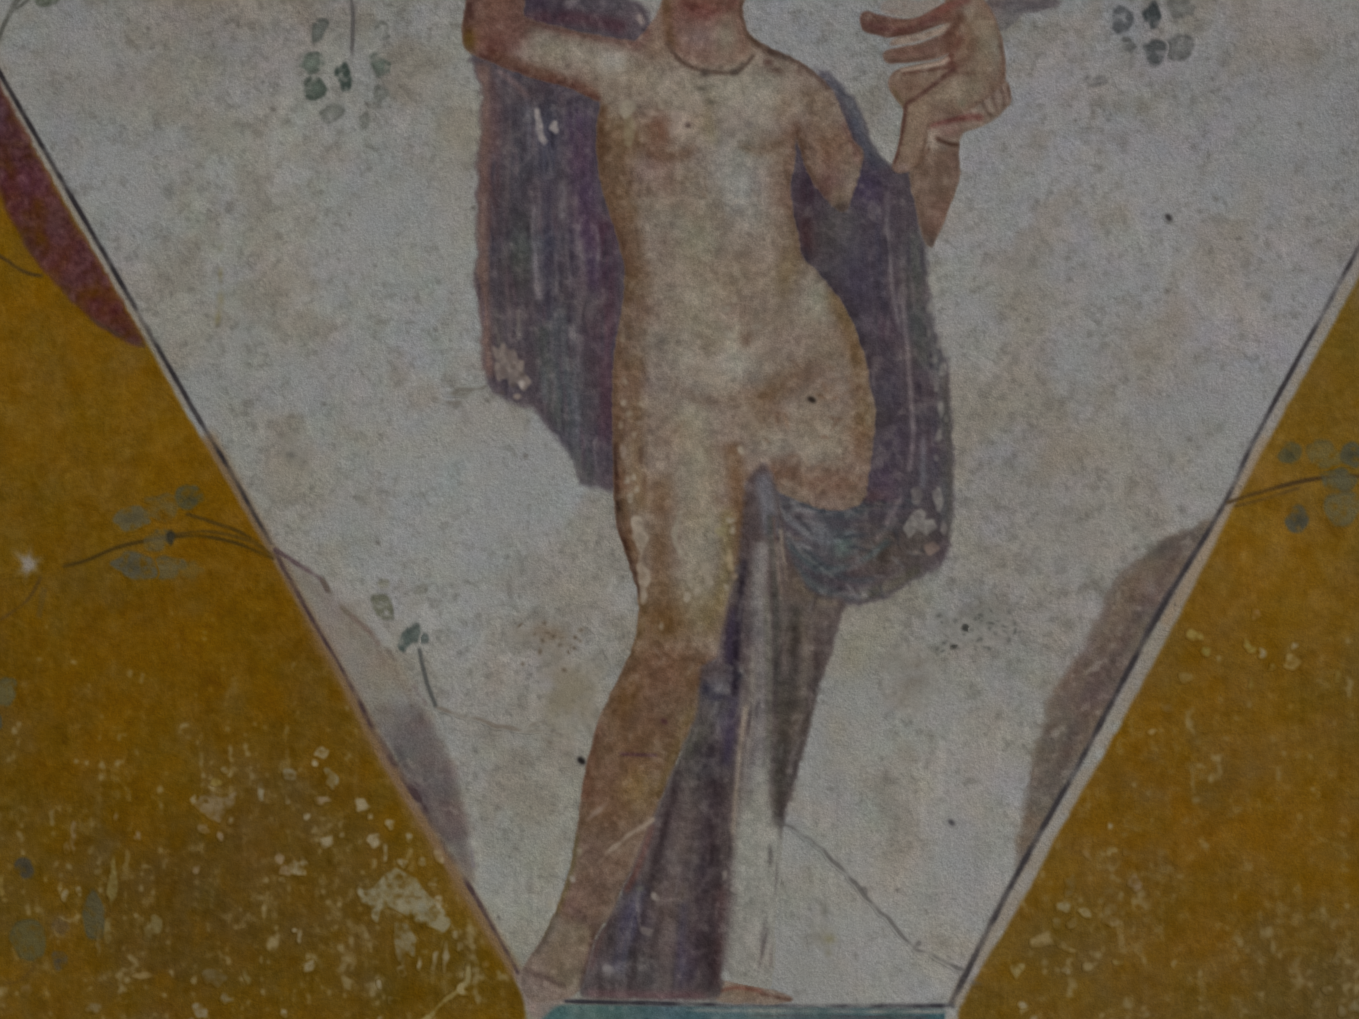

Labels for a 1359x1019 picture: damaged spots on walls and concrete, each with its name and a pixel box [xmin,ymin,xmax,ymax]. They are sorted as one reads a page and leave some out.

peeling [1242,637,1303,692]
peeling [95,829,142,957]
peeling [189,765,238,843]
peeling [273,851,309,883]
peeling [281,745,341,822]
peeling [319,831,346,850]
peeling [353,797,464,1019]
crack [775,818,984,988]
peeling [1029,873,1124,976]
peeling [186,968,253,1019]
peeling [302,958,316,973]